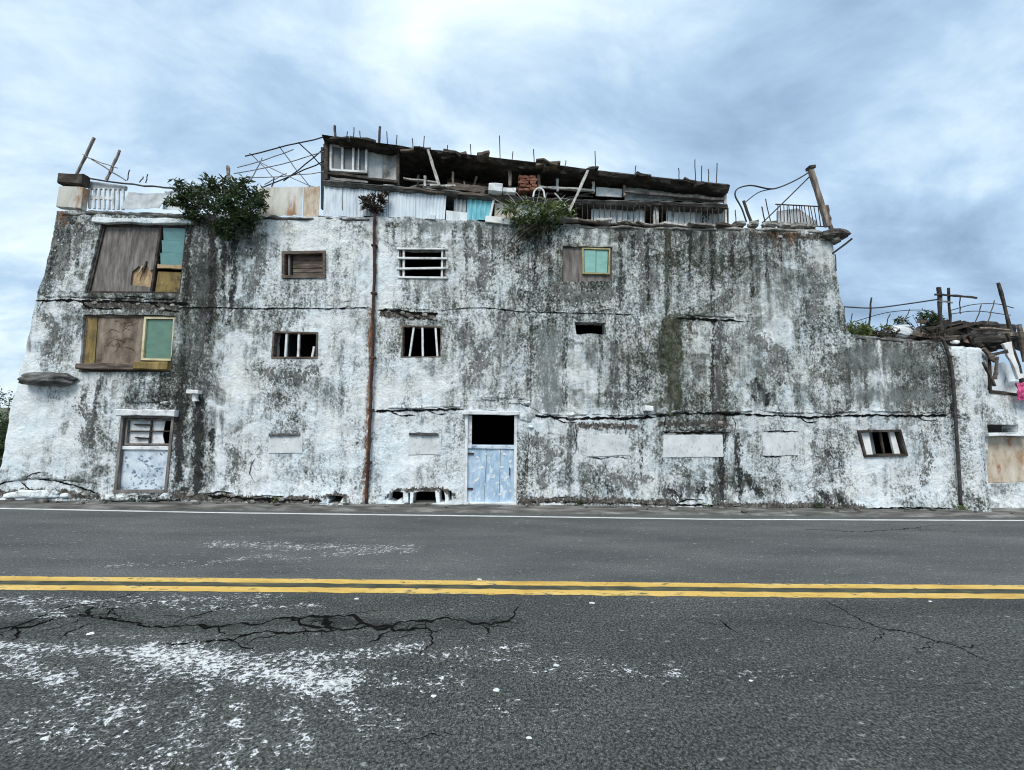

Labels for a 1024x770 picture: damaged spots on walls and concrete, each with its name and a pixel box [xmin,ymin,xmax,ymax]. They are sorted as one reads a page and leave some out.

crack [36,296,633,322]
damp [79,374,107,452]
damp [174,214,255,493]
corrosion [361,308,374,497]
crack [376,408,463,417]
damp [392,218,579,485]
damp [597,340,631,413]
damp [611,228,813,507]
crack [0,472,97,494]
crack [512,403,947,507]
mould [806,488,856,508]
crack [766,503,953,511]